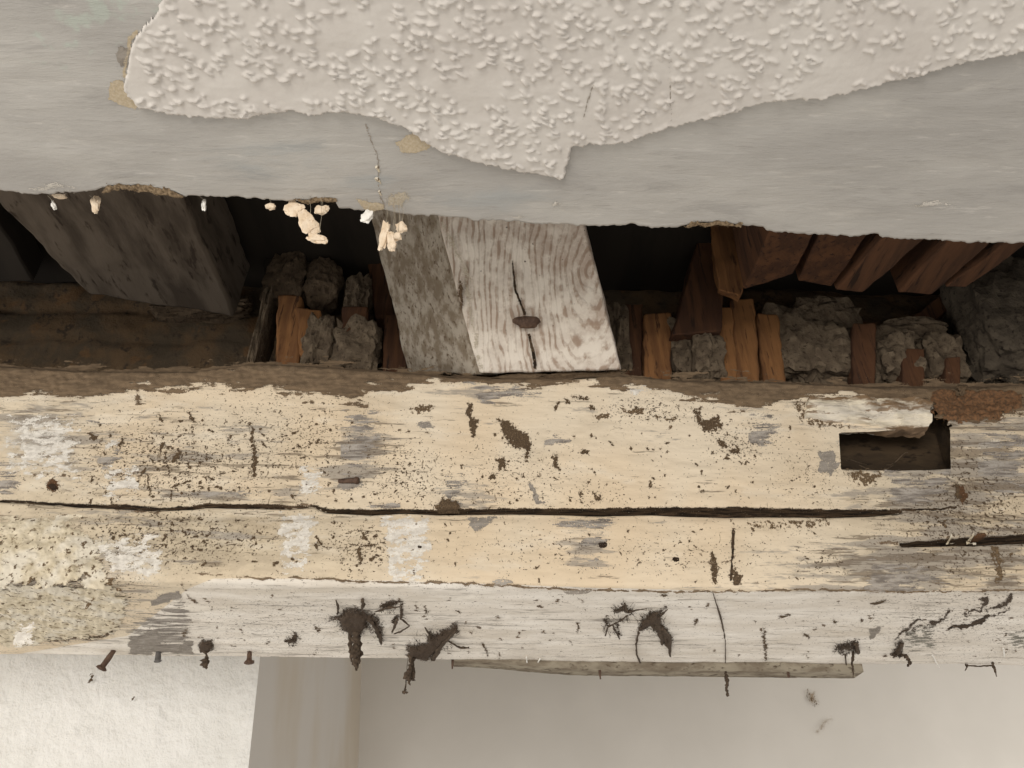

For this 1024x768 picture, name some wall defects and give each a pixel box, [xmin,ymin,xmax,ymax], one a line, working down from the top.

peeling [106,0,1024,180]
peeling [47,193,67,210]
spalling [90,183,183,214]
peeling [265,196,337,244]
peeling [353,198,407,252]
crack [512,262,537,369]
peeling [138,417,281,498]
peeling [286,409,401,509]
peeling [711,409,791,465]
peeling [443,464,505,542]
crack [0,425,1024,640]
spalling [0,514,204,656]